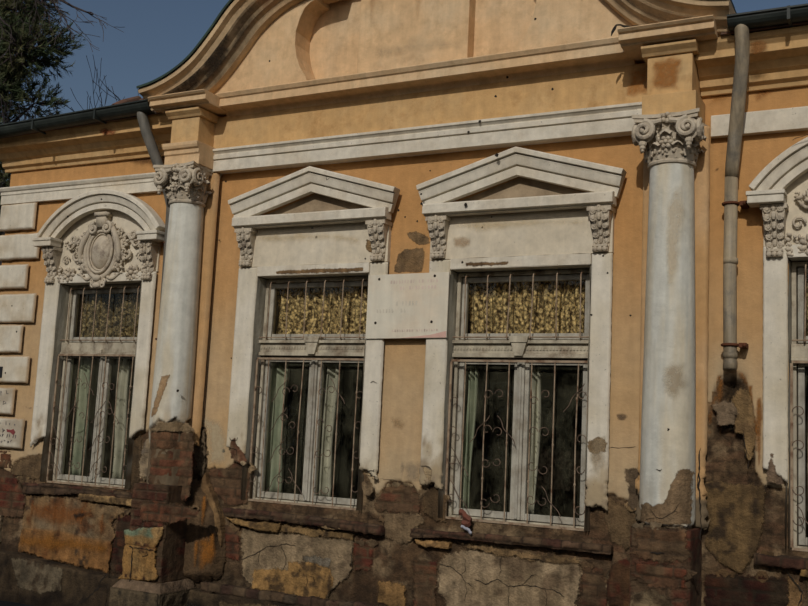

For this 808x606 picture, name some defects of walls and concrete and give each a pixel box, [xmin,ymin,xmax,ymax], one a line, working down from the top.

water stain [162,14,254,95]
flaking render [394,220,430,273]
spalling [0,451,46,518]
spalling [110,374,258,574]
spalling [353,476,425,571]
peeling [587,437,607,454]
spalling [625,468,695,563]
crack [441,556,564,606]
spalling [703,569,790,606]